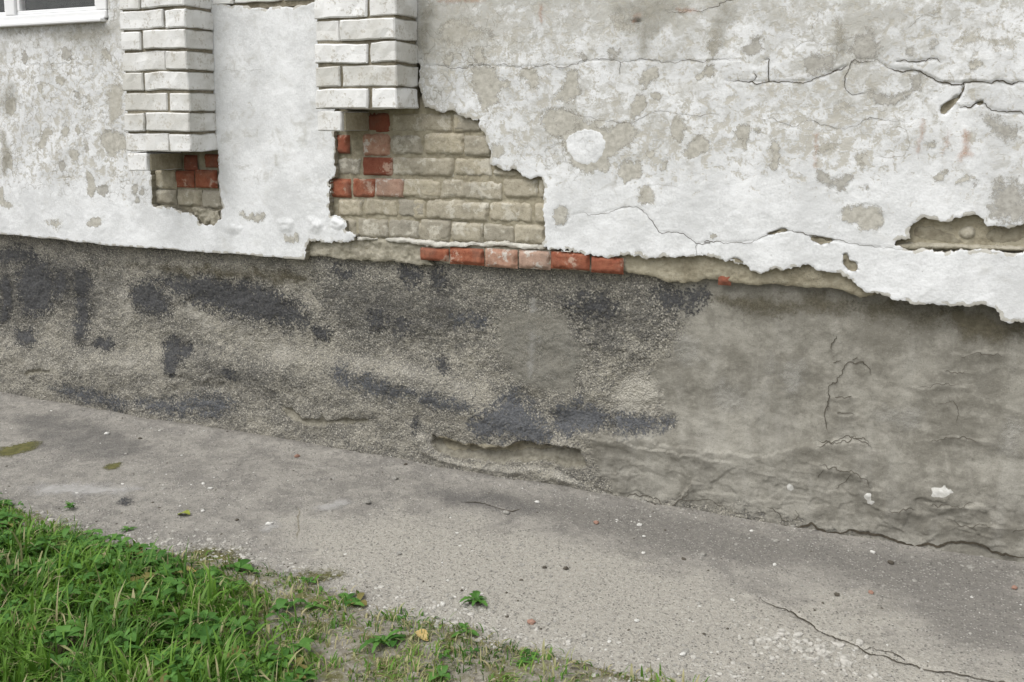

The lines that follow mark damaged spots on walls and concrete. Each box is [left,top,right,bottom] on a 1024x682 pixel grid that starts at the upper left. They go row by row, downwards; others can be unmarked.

spalling [131,150,223,225]
spalling [284,50,877,297]
crack [576,206,901,250]
peeling [841,204,884,232]
spalling [895,176,1024,252]
damp [0,243,116,355]
damp [128,265,334,343]
damp [48,366,236,421]
damp [330,361,676,446]
crack [818,336,871,489]
crack [589,484,724,507]
crack [768,502,1024,558]